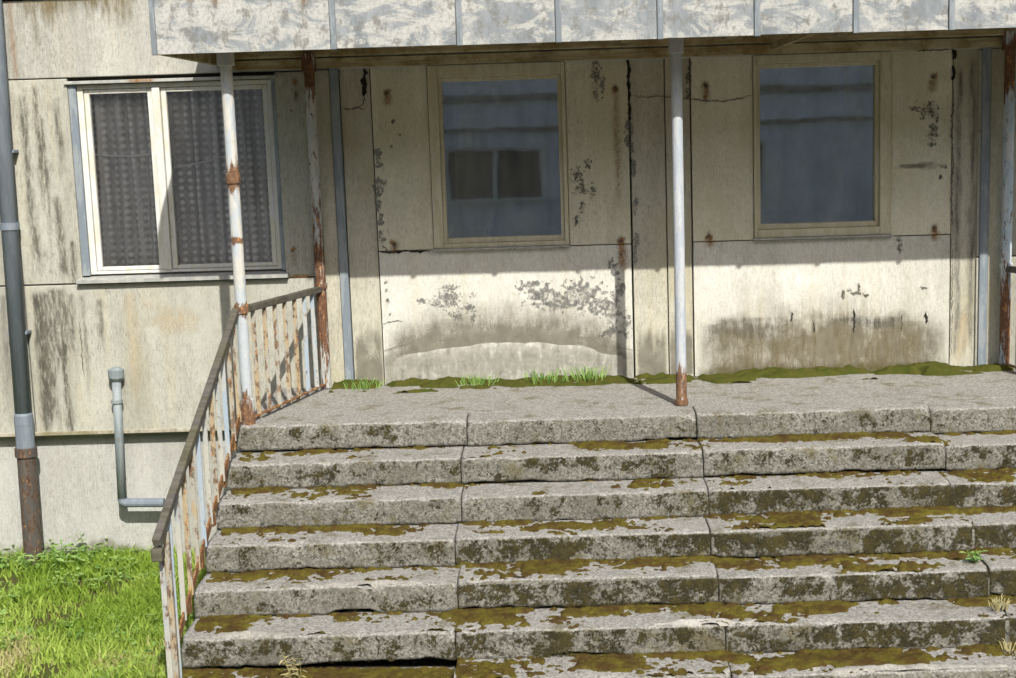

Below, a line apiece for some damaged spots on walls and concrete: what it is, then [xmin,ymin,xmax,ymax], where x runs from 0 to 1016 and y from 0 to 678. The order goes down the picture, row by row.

crack [343,68,368,110]
spalling [623,112,637,177]
crack [626,60,750,174]
peeling [909,101,940,147]
peeling [570,159,596,227]
peeling [416,284,476,321]
peeling [515,232,639,339]
damp [33,290,86,431]
damp [398,320,619,356]
damp [712,318,935,374]